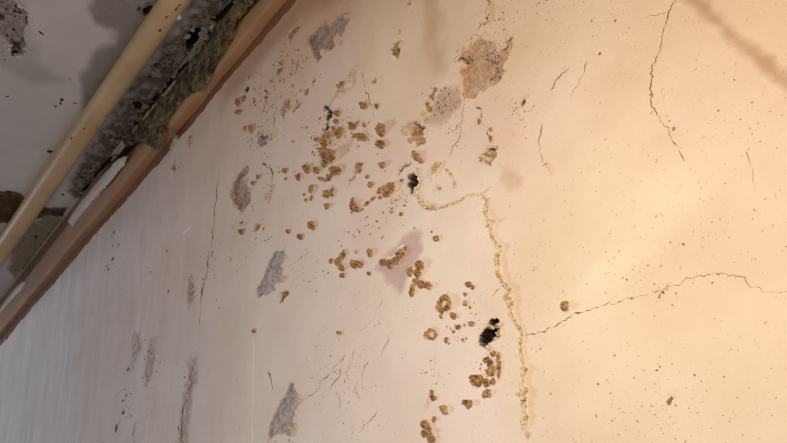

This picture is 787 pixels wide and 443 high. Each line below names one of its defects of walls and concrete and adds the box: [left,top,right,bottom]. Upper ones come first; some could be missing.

peeling [0,0,33,59]
damp [71,0,258,197]
peeling [254,7,354,154]
spalling [439,0,518,107]
crack [645,0,685,161]
peeling [228,161,255,216]
flaking render [359,112,468,227]
crack [199,179,219,322]
peeling [253,245,292,309]
spalling [475,312,506,353]
crack [429,186,787,440]
peeling [265,376,304,443]